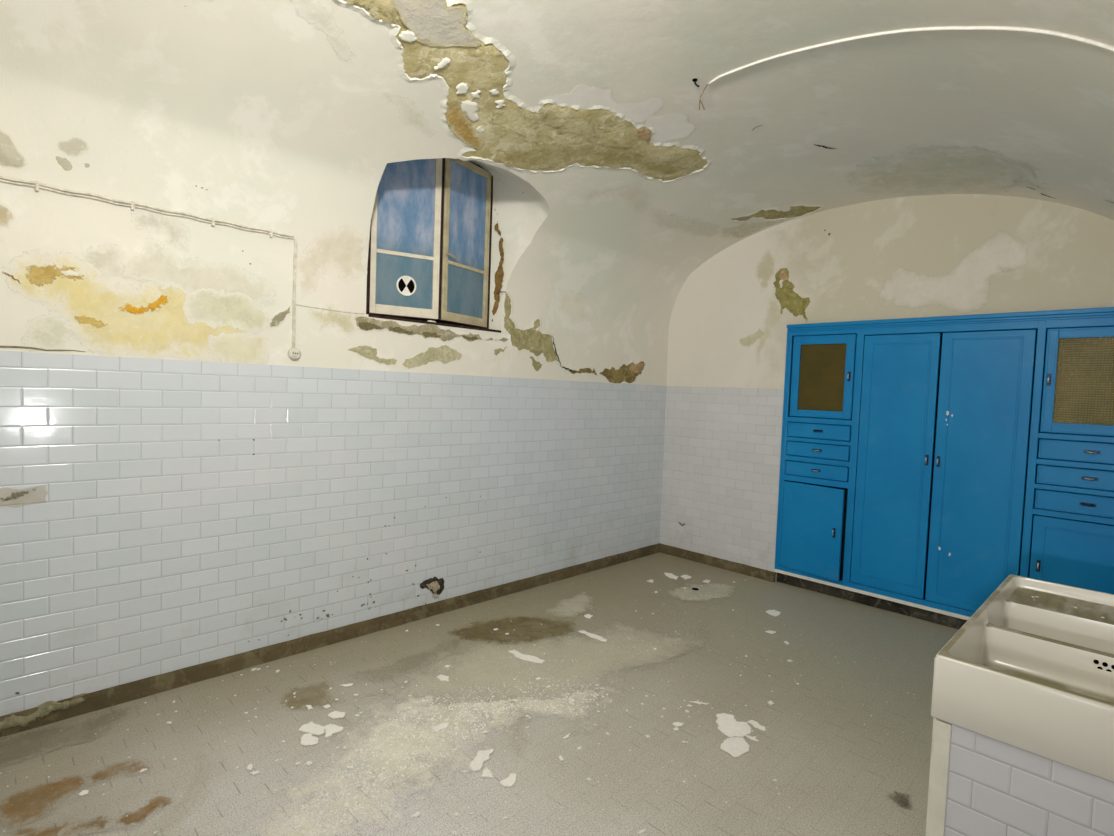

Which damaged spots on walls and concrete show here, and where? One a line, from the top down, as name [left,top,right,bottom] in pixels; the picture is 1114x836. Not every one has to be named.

peeling [332,0,713,183]
leakage [845,144,1050,196]
peeling [727,204,827,223]
leakage [1,211,276,364]
peeling [771,266,813,323]
peeling [346,290,646,384]
spalling [420,577,444,599]